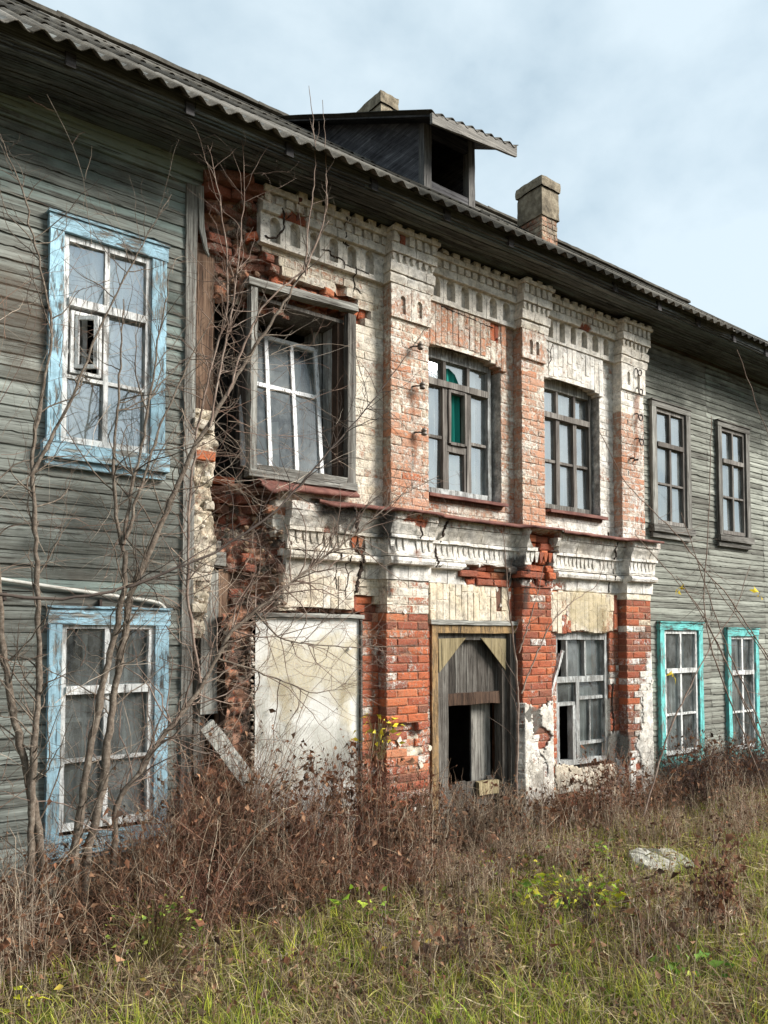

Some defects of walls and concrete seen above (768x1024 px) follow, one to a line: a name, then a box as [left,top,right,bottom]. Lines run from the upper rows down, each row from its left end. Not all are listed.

spalling [197,169,366,325]
crack [265,197,305,239]
crack [322,217,369,294]
crack [333,509,366,597]
crack [415,520,449,595]
peeling [190,408,432,811]
peeling [458,534,654,818]